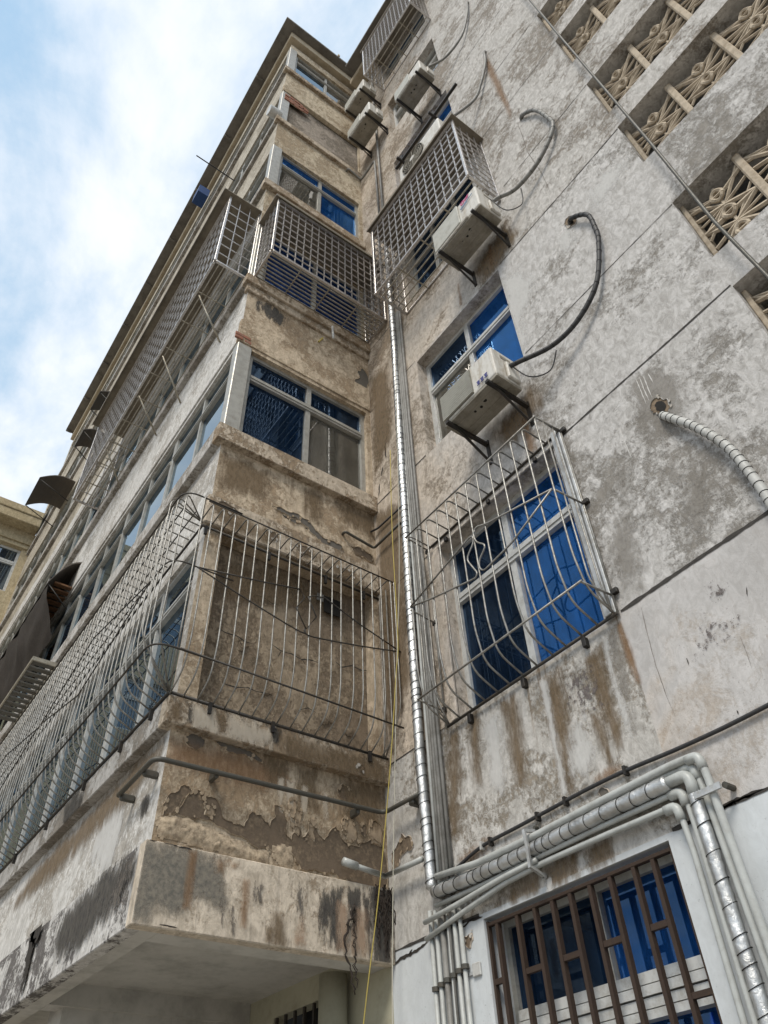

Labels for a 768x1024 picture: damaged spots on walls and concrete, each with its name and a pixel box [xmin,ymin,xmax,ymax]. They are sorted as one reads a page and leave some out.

water stain [540,629,630,794]
water stain [15,728,385,958]
spalling [162,783,413,888]
water stain [288,875,396,963]